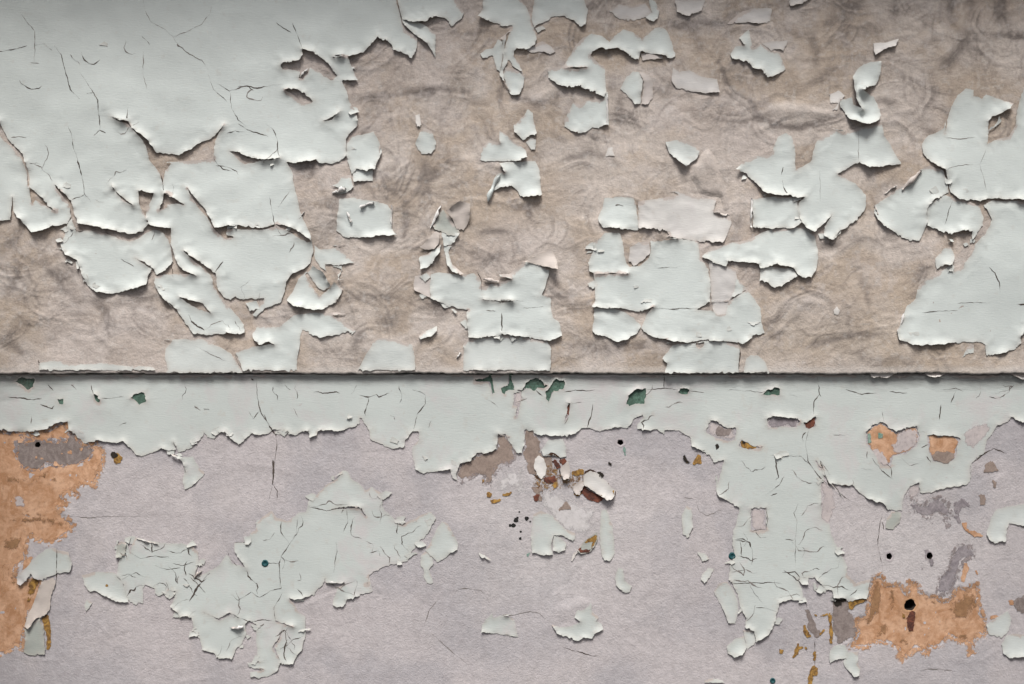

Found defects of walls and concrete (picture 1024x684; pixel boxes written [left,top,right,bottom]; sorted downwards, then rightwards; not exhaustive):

crack [0,14,137,135]
crack [124,2,279,174]
peeling [0,0,464,335]
peeling [165,312,355,373]
crack [190,318,430,497]
peeling [414,201,562,371]
peeling [585,61,901,374]
peeling [874,88,1024,357]
crack [119,543,210,606]
crack [220,493,419,662]
peeling [0,355,1024,679]
crack [685,377,931,620]